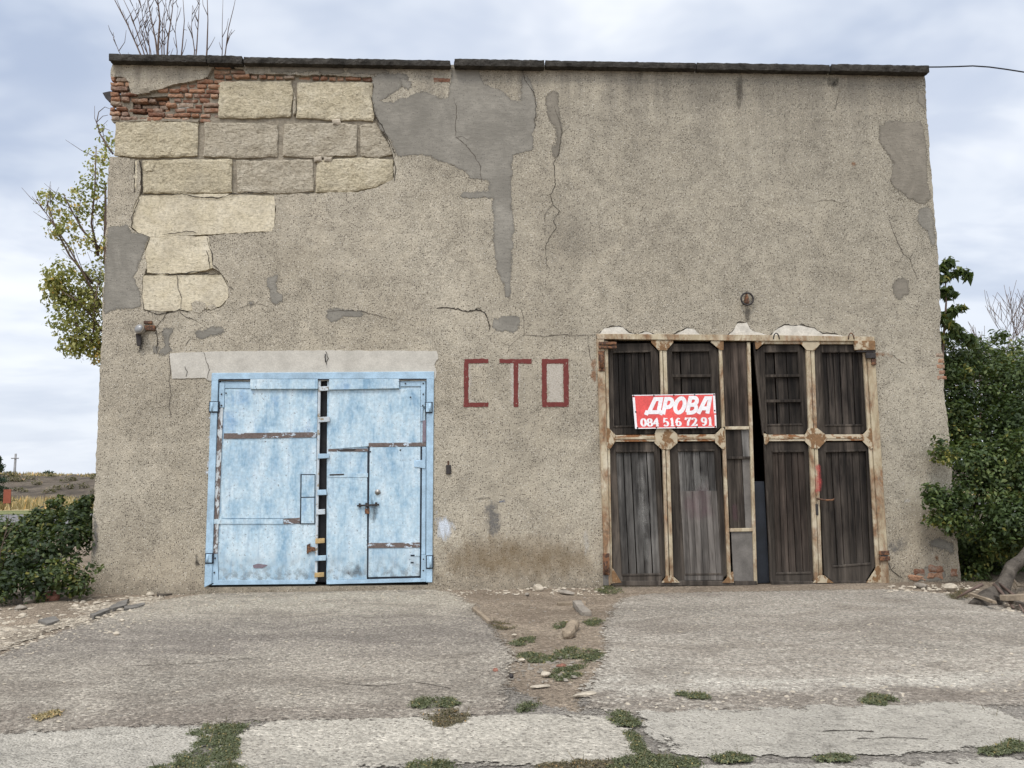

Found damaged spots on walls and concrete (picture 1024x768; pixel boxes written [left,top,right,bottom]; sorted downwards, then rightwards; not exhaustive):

spalling [110,67,394,313]
crack [522,71,569,265]
crack [440,307,691,358]
spalling [908,564,958,582]